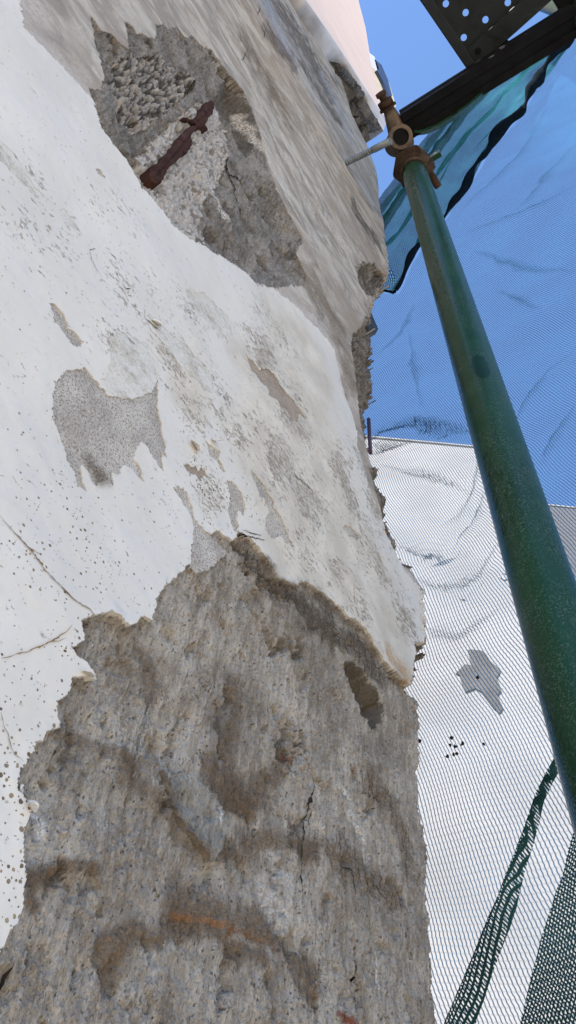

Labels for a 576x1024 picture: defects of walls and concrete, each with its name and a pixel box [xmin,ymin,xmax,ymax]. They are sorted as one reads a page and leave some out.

spalling [89,18,306,289]
peeling [52,314,213,490]
peeling [248,359,304,421]
crack [1,516,95,659]
spalling [0,439,436,1024]
crack [299,773,315,905]